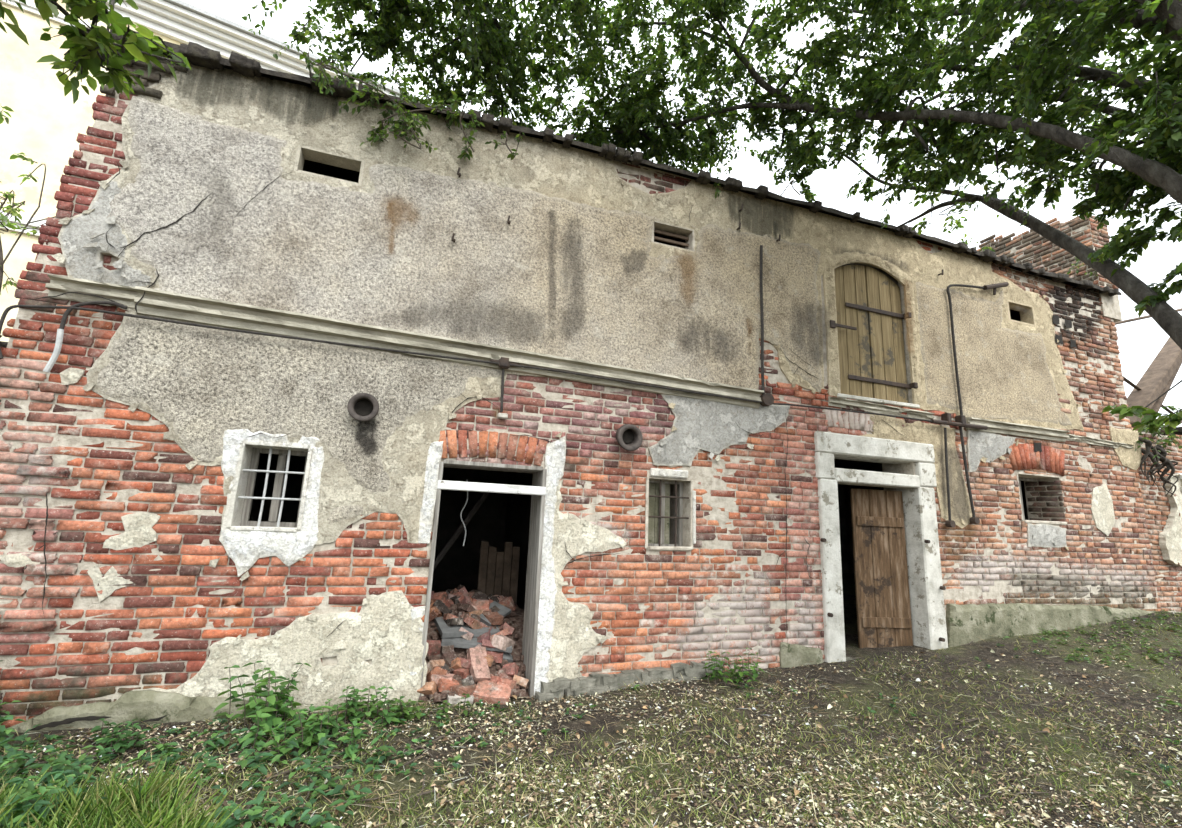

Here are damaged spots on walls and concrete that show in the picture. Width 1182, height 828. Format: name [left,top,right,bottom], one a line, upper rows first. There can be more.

crack [35,269,160,314]
crack [106,192,213,256]
spalling [0,58,433,728]
spalling [446,263,1182,682]